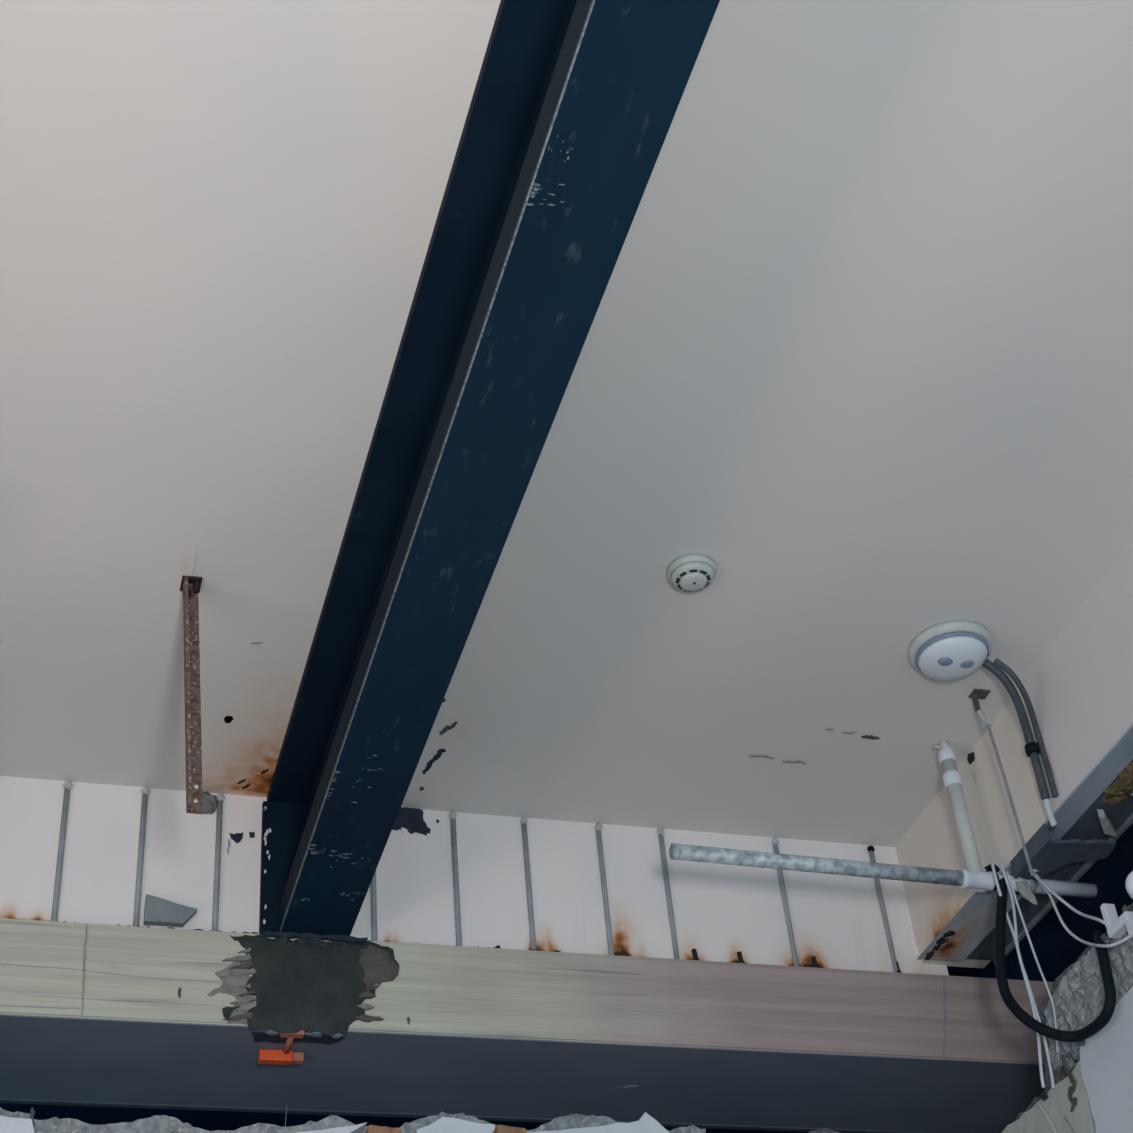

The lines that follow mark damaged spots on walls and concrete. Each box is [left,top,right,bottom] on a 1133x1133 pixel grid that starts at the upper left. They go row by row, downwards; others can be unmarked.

rust [146,648,186,791]
rust [200,651,307,798]
peeling [419,749,446,791]
peeling [392,807,439,840]
peeling [1097,809,1117,837]
rust [934,838,967,871]
rust [0,898,72,922]
rust [514,883,1023,976]
spalling [1043,932,1133,1071]
spalling [252,1029,344,1045]